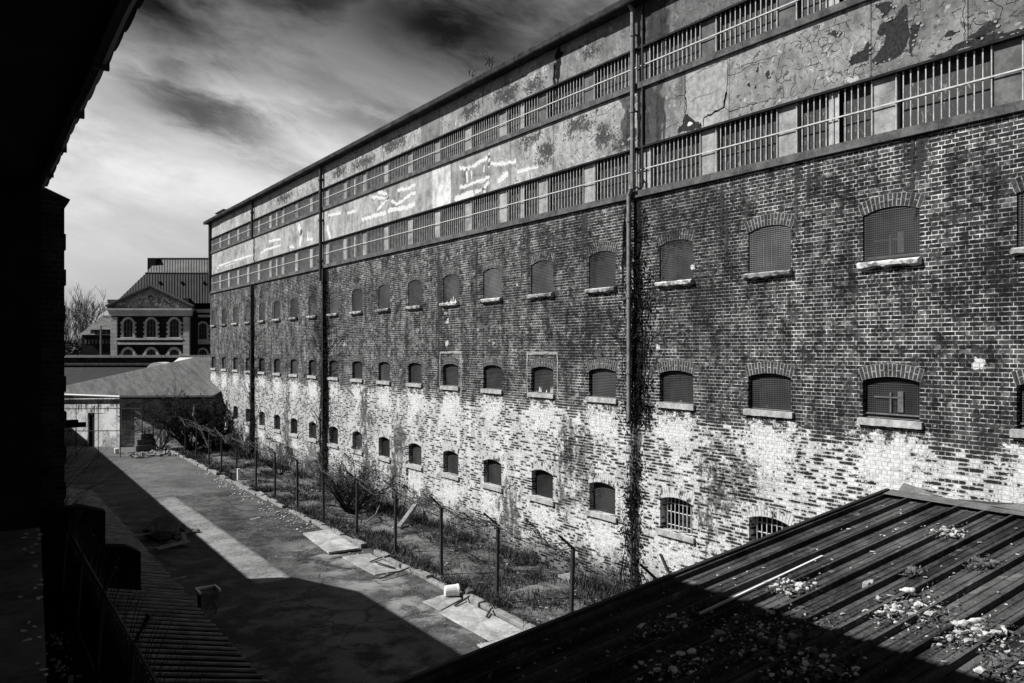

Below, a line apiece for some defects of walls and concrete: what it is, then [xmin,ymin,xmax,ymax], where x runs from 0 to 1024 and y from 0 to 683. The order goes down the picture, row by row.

water stain [552,47,563,115]
crack [666,0,1018,129]
flaking render [848,1,924,66]
flaking render [930,18,1024,58]
flaking render [677,112,702,134]
water stain [211,268,584,550]
water stain [575,197,736,592]
water stain [740,418,803,492]
water stain [843,424,936,495]
water stain [991,438,1024,504]